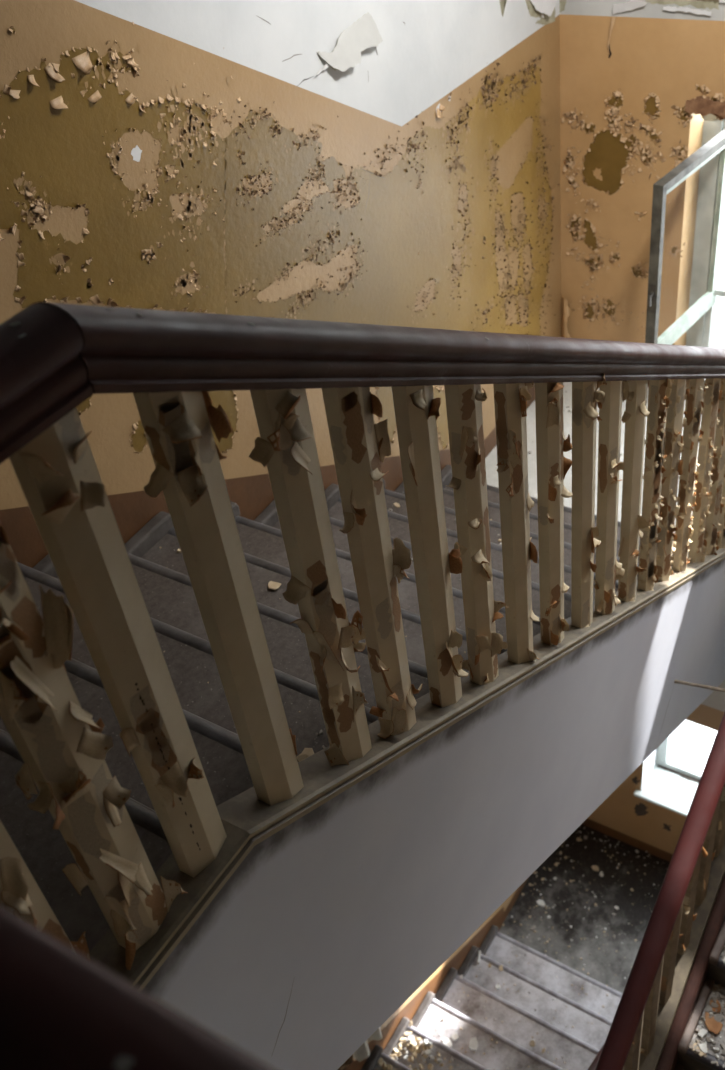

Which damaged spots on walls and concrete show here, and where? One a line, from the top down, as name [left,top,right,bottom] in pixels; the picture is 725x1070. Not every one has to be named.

peeling [317,12,382,75]
spalling [613,0,725,16]
peeling [0,40,725,340]
peeling [129,395,203,482]
peeling [207,390,238,453]
peeling [330,387,396,495]
peeling [433,385,486,486]
peeling [494,391,548,526]
peeling [549,383,594,487]
peeling [598,444,620,493]
peeling [605,379,725,615]
peeling [0,596,53,738]